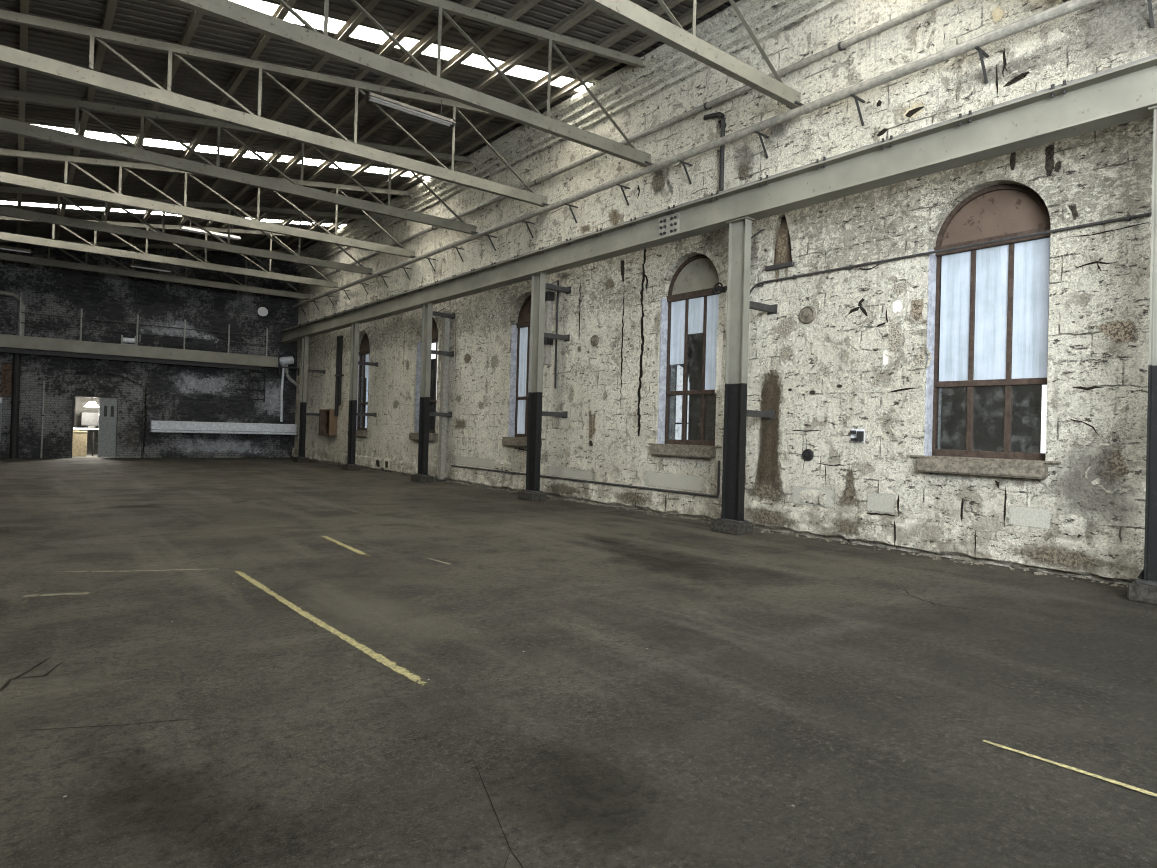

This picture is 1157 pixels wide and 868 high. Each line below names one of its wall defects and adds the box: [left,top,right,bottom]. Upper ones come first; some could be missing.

crack [620,249,648,436]
corrosion [745,371,799,526]